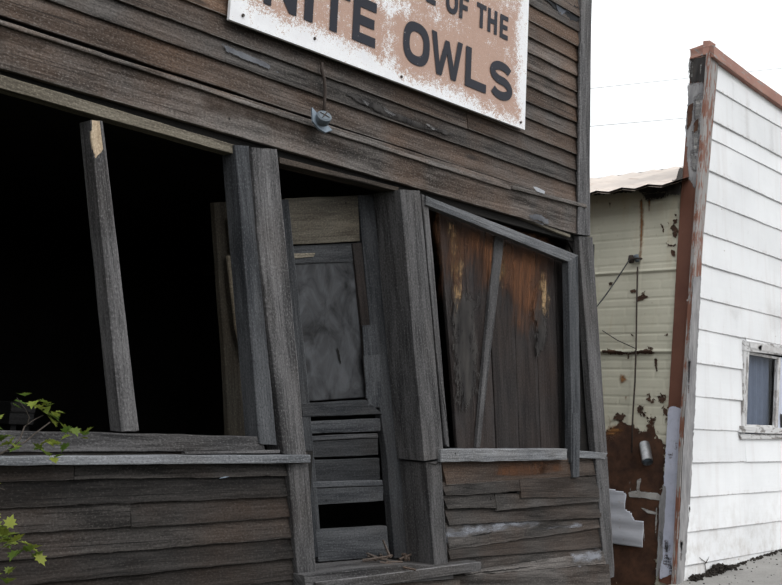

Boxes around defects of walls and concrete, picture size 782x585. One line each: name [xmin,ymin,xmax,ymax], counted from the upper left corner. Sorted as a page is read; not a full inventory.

peeling [685,56,706,188]
peeling [629,276,701,584]